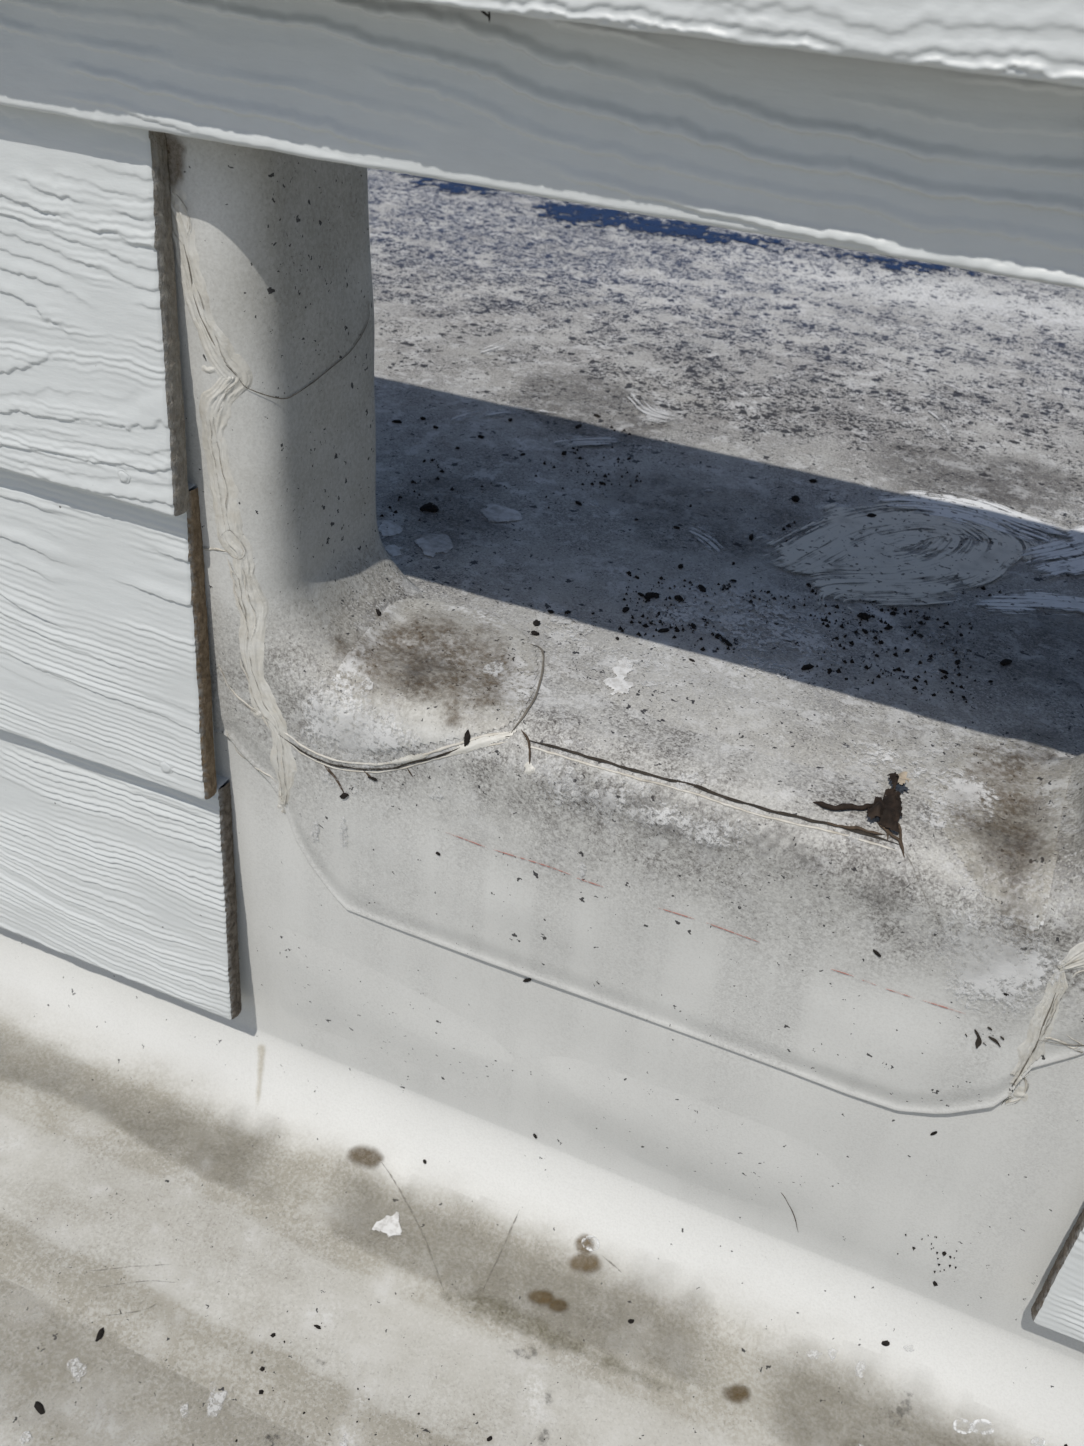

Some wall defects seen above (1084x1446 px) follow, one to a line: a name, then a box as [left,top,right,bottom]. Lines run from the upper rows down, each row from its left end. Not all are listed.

damp [338,621,508,704]
crack [278,644,925,895]